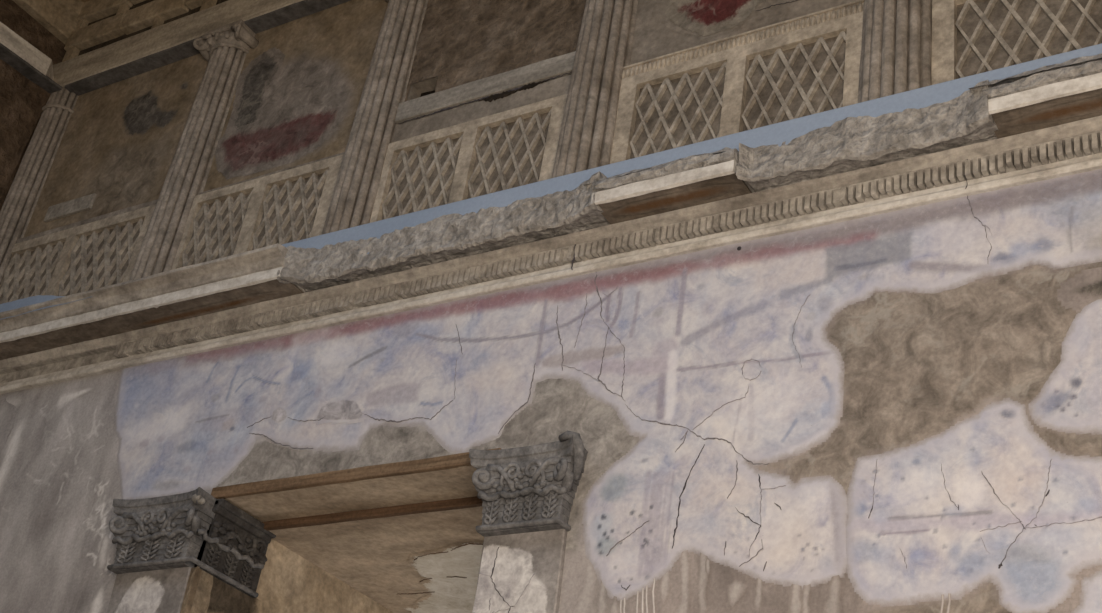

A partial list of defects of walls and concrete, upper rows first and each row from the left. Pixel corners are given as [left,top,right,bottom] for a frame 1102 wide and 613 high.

leakage [0,373,121,613]
flaking render [192,395,456,505]
crack [364,325,462,423]
flaking render [472,378,639,570]
crack [556,244,786,571]
flaking render [759,262,1102,495]
crack [980,459,1102,569]
flaking render [400,539,483,613]
crack [478,547,535,613]
leakage [574,550,710,613]
leakage [726,578,763,613]
leakage [788,575,843,613]